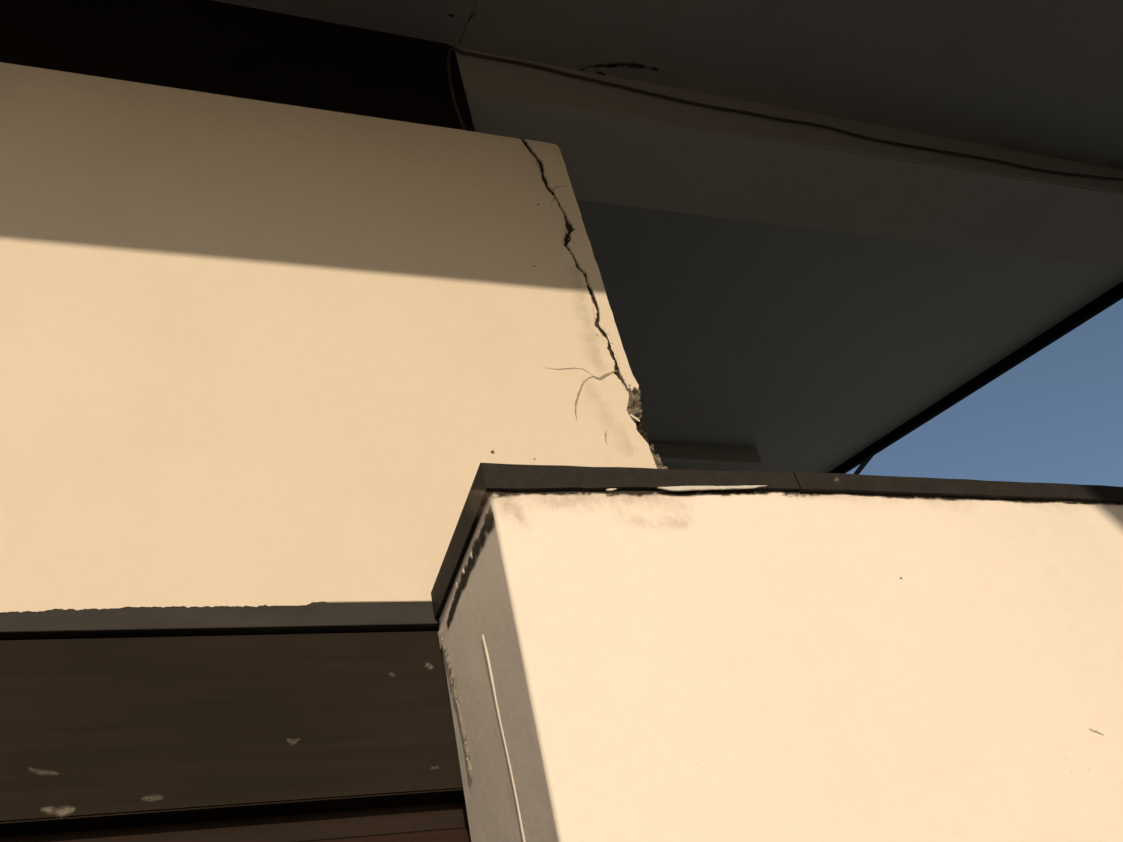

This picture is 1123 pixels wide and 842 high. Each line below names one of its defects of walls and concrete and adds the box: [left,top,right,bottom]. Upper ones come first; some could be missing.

crack [521,140,627,419]
spalling [524,139,668,469]